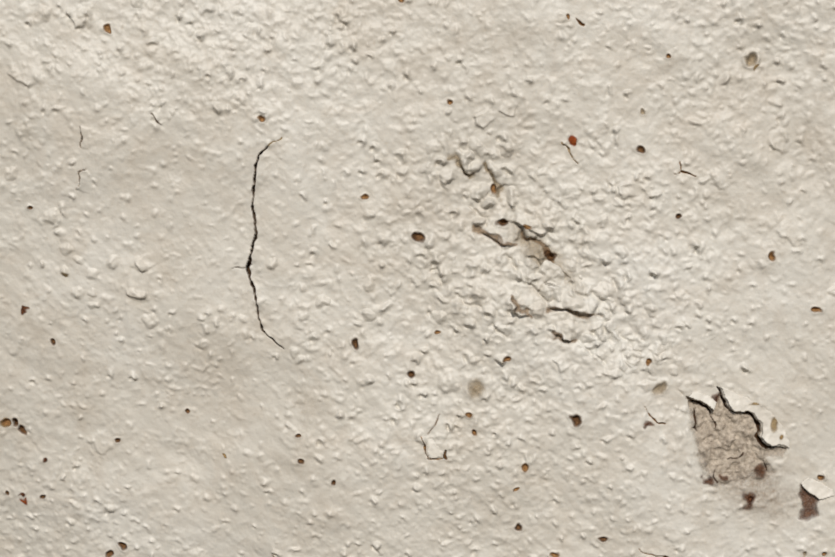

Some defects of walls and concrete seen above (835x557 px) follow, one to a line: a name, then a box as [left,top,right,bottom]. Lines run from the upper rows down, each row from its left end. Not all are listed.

crack [235,137,283,348]
peeling [686,386,790,485]
peeling [800,475,835,519]